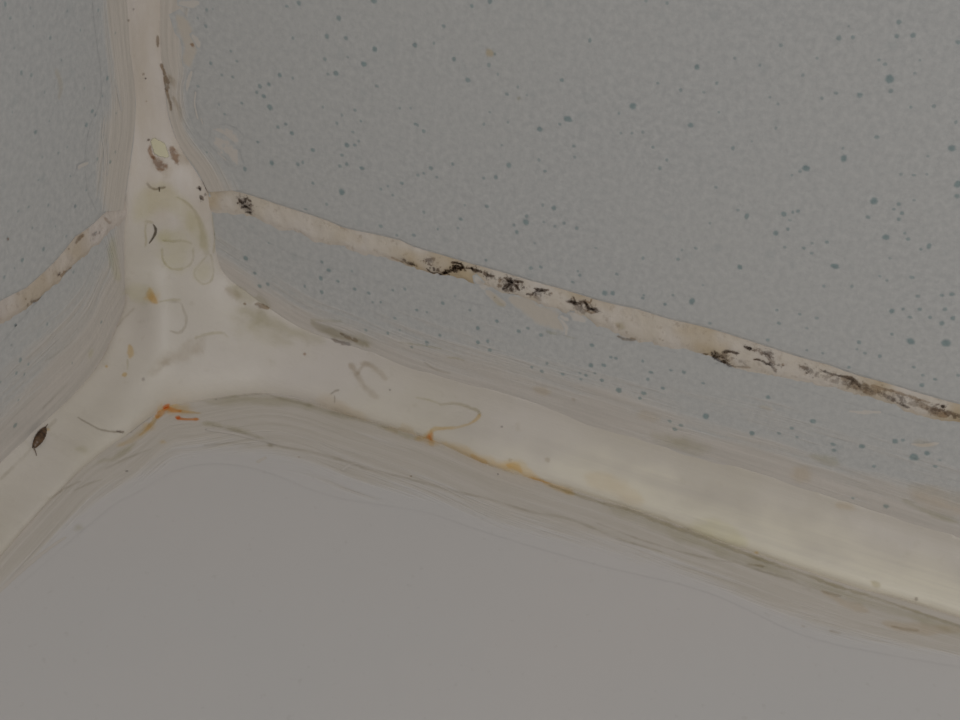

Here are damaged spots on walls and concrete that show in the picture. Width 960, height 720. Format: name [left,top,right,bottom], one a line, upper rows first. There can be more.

water stain [411,262,485,274]